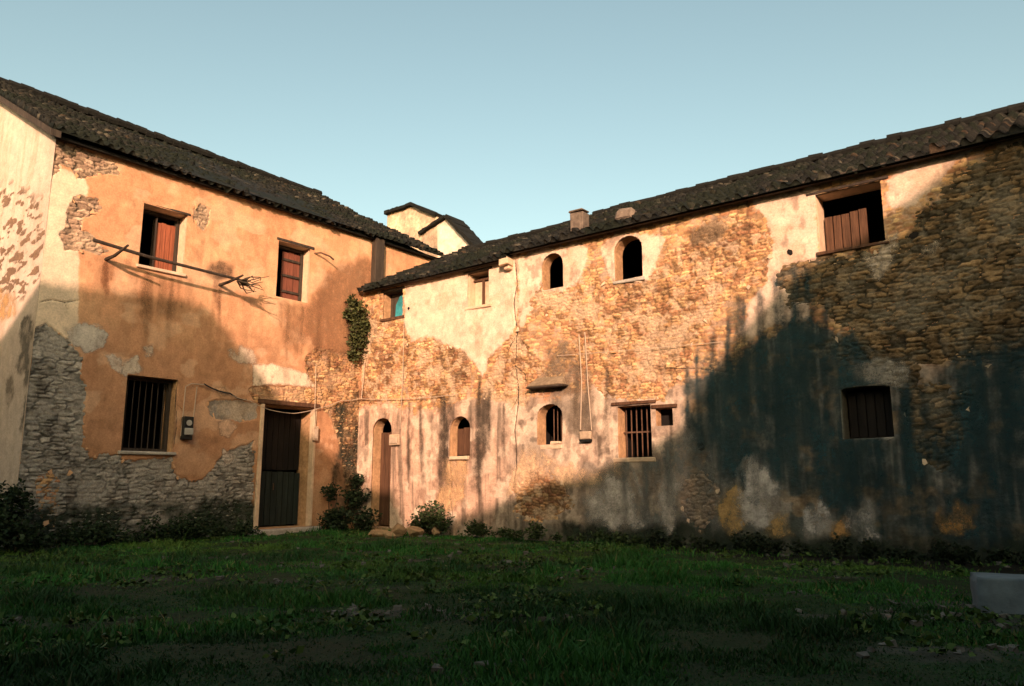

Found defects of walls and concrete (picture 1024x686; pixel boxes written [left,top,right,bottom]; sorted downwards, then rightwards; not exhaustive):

spalling [53,139,120,179]
flaking render [0,184,256,550]
flaking render [207,317,471,512]
damp [438,398,452,491]
damp [474,379,491,492]
flaking render [529,138,1024,473]